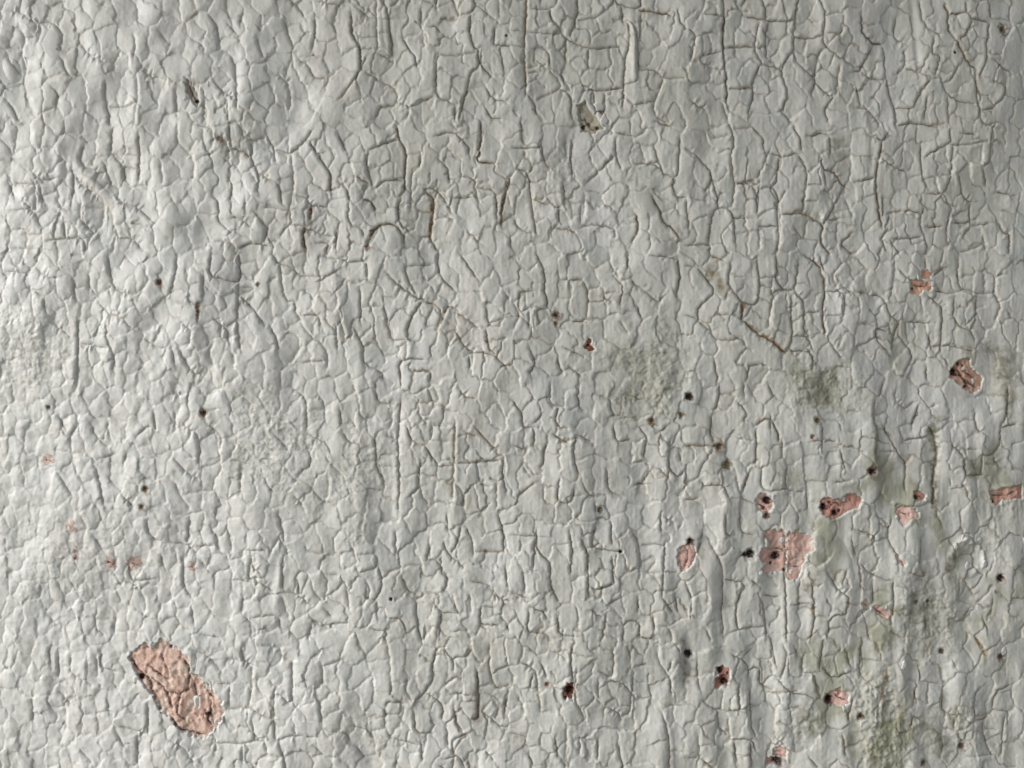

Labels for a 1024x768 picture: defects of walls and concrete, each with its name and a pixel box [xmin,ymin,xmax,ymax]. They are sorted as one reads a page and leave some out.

peeling [910,270,935,295]
peeling [949,358,982,393]
peeling [819,494,862,519]
peeling [895,491,928,526]
peeling [989,485,1022,506]
peeling [677,537,696,571]
peeling [755,493,814,580]
peeling [128,638,225,738]
peeling [713,665,730,689]
peeling [824,687,864,727]